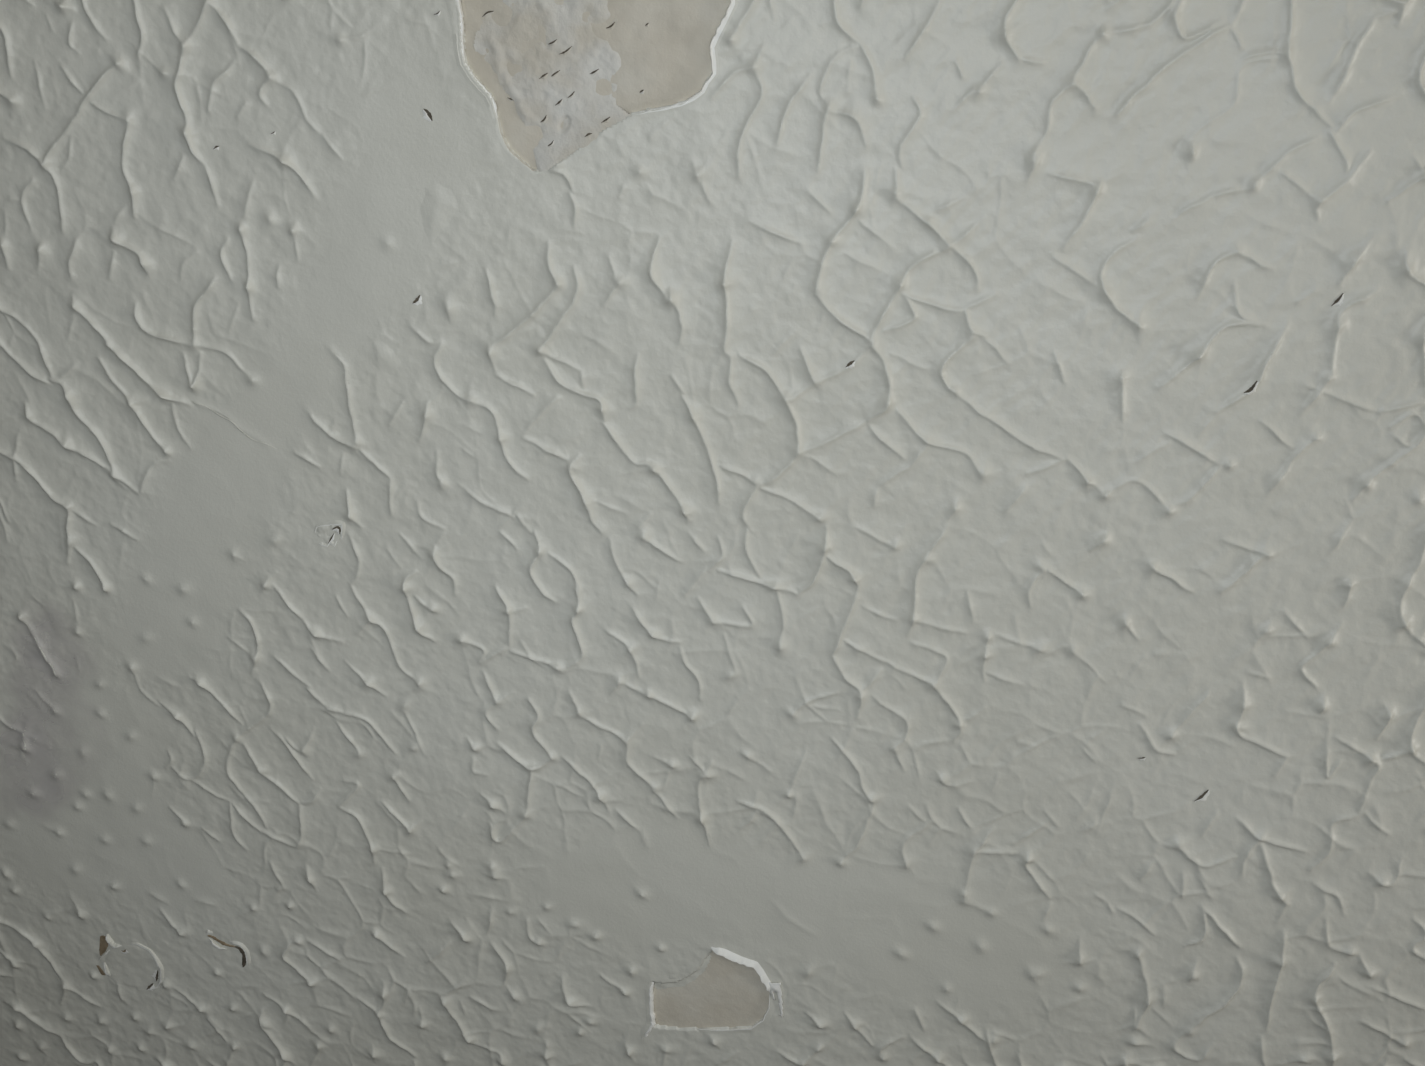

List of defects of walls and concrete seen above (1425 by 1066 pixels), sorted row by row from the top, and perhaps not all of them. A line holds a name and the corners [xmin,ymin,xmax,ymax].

peeling [445,0,738,175]
peeling [640,947,783,1040]